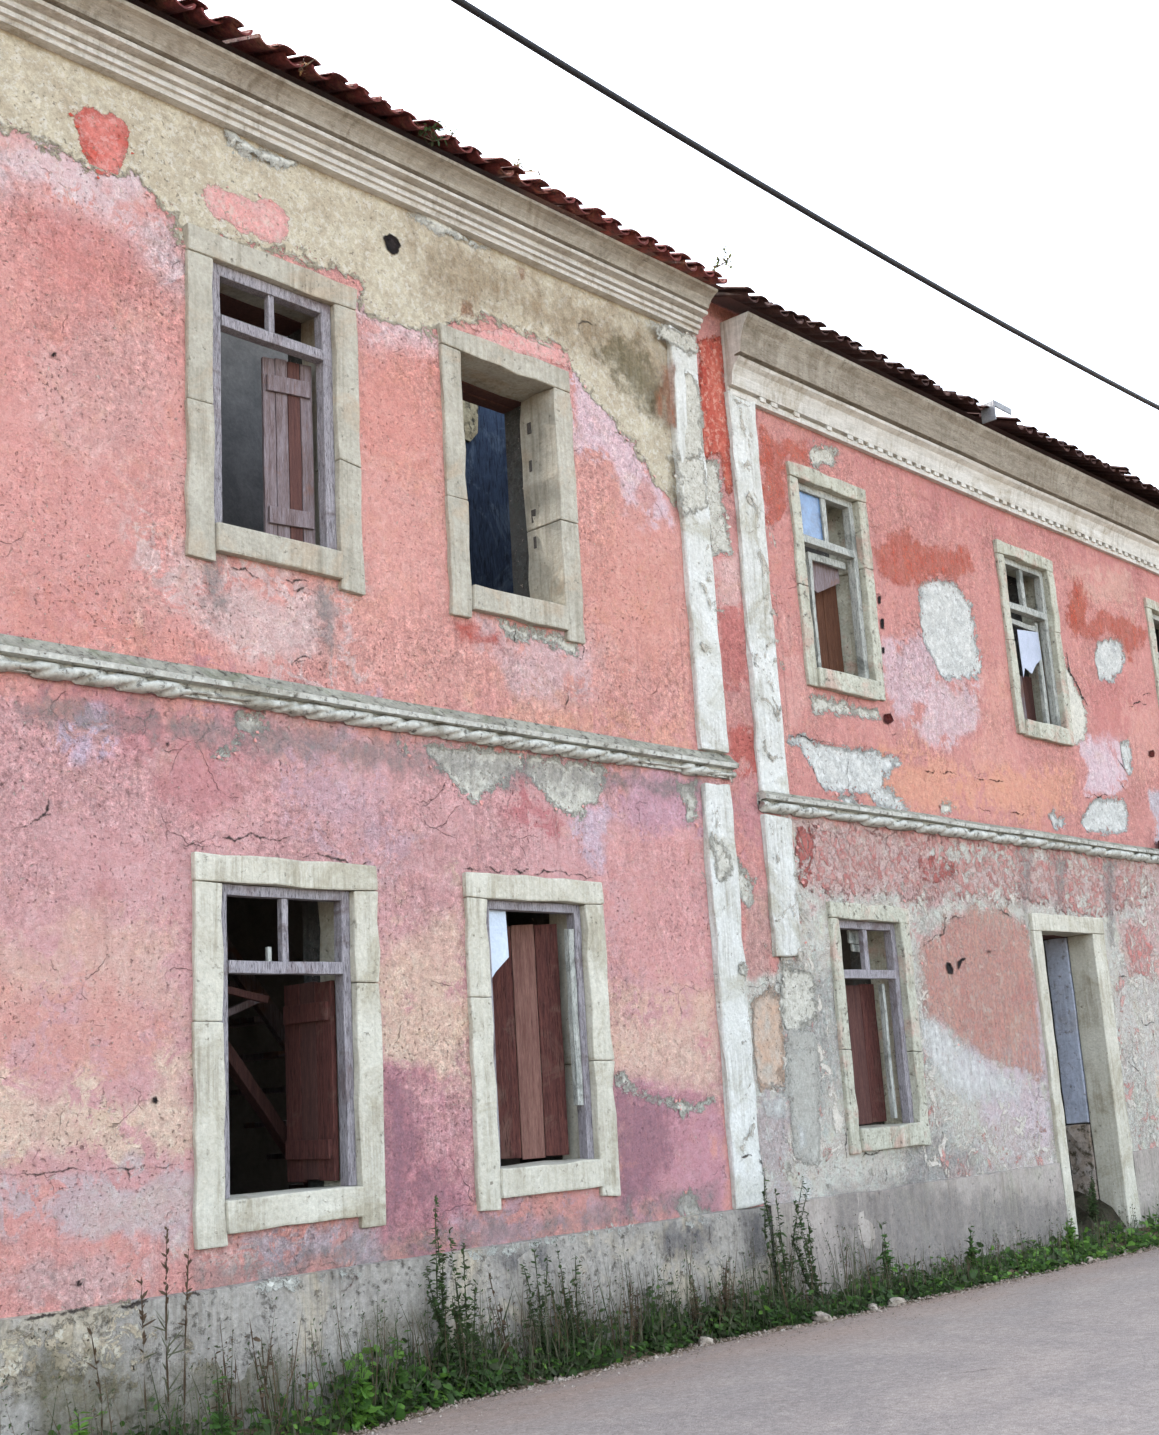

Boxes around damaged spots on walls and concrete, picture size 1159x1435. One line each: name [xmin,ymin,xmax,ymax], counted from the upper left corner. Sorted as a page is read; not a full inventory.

flaking render [0,29,739,623]
peeling [730,395,753,471]
peeling [747,482,779,577]
flaking render [397,738,610,822]
flaking render [752,638,911,811]
flaking render [918,576,982,682]
flaking render [1064,654,1089,747]
flaking render [1094,637,1128,683]
flaking render [1120,739,1133,776]
flaking render [675,752,757,908]
peeling [726,796,1159,1200]